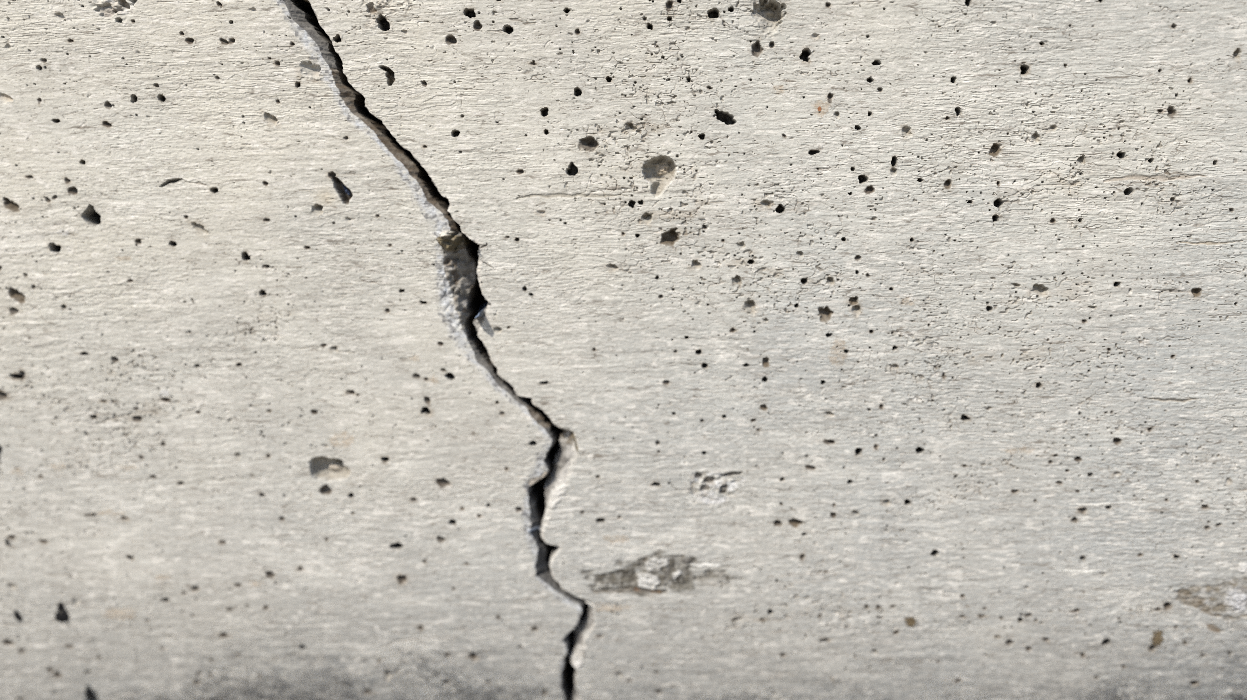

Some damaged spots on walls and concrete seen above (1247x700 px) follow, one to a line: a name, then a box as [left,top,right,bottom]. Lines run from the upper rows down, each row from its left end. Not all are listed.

crack [272,0,618,700]